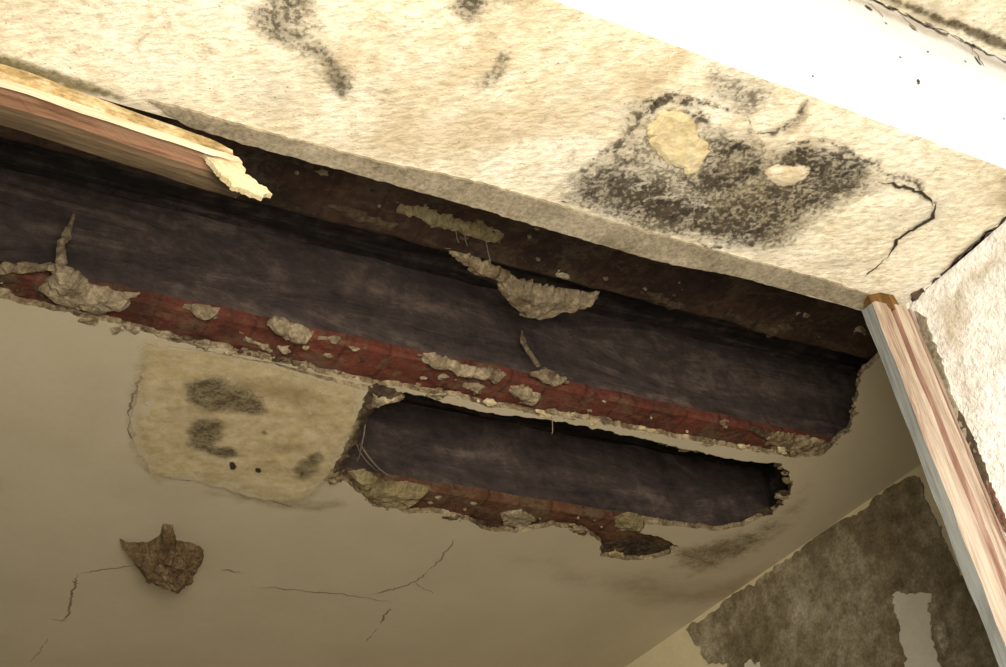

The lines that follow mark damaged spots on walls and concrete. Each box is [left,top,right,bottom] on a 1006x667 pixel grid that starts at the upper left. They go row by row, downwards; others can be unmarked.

damp [257,0,309,43]
damp [580,73,936,249]
peeling [149,99,934,320]
crack [864,182,936,277]
peeling [0,261,144,335]
peeling [239,316,341,355]
damp [190,421,237,470]
damp [187,379,264,413]
peeling [417,352,714,453]
peeling [737,425,828,517]
flaking render [600,539,670,557]
flaking render [686,475,999,667]